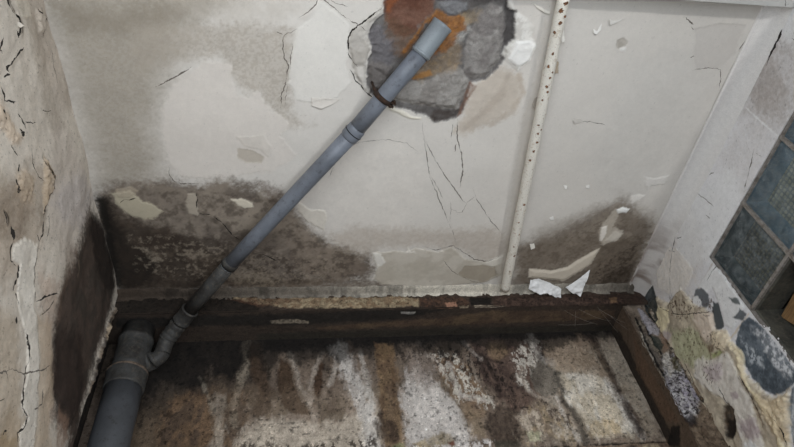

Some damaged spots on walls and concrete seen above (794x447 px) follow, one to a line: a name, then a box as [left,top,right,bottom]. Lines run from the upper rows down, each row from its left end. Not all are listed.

crack [277,0,381,107]
peeling [286,0,403,104]
rust [380,0,468,82]
spalling [387,0,538,124]
crack [767,30,794,62]
damp [445,15,661,285]
crack [0,0,59,447]
damp [220,205,381,288]
peeling [527,174,671,282]
damp [50,170,287,447]
damp [137,331,662,447]
spalling [634,246,794,447]